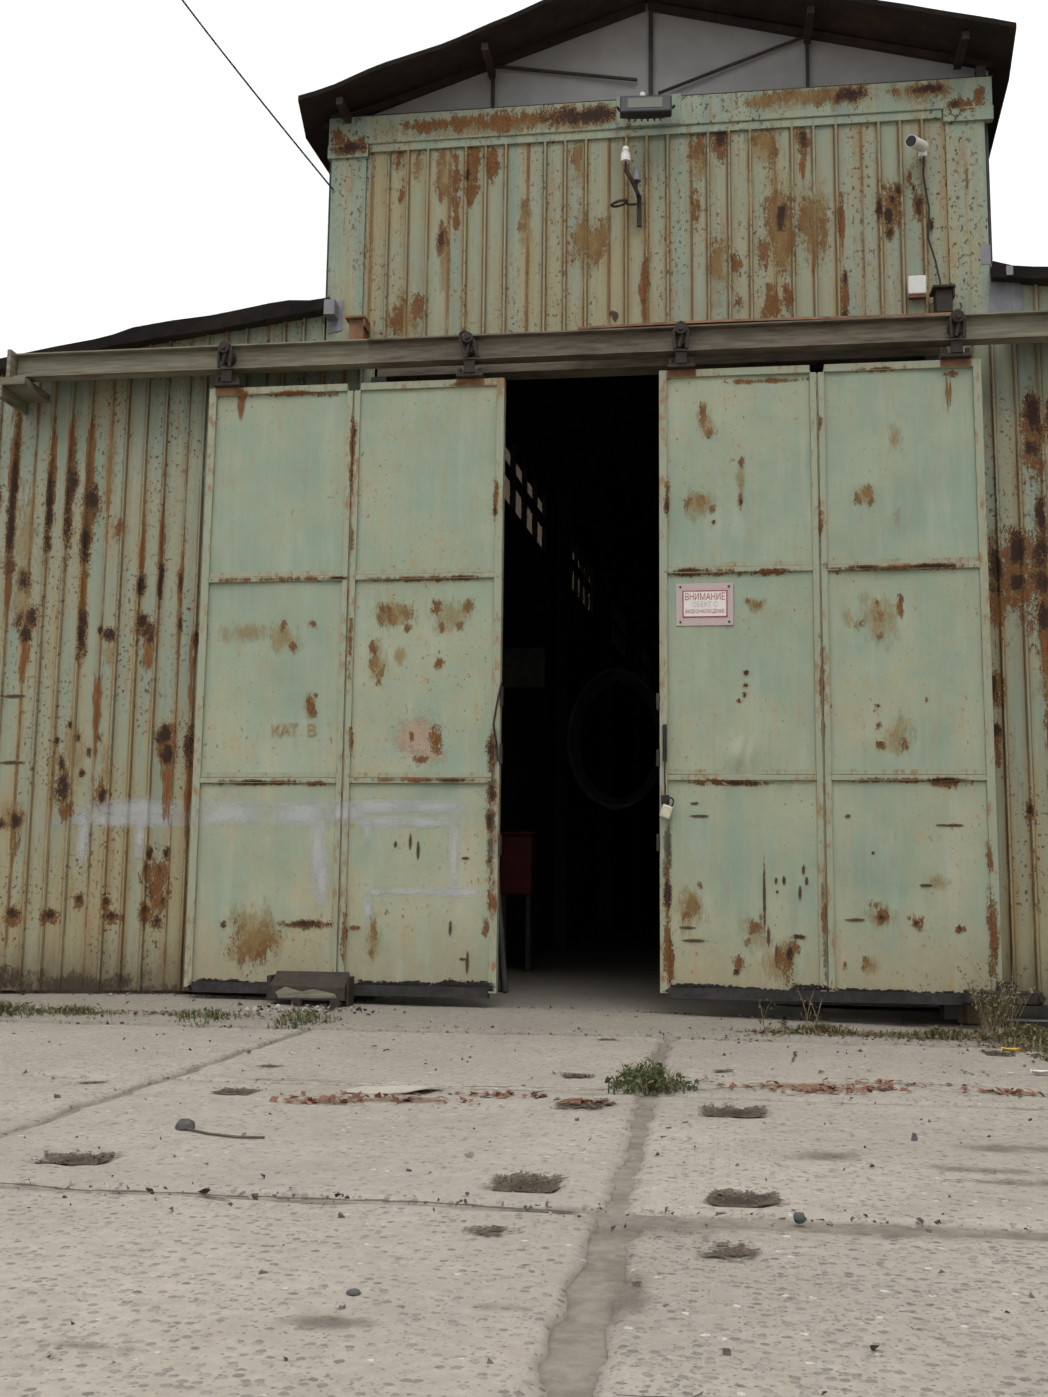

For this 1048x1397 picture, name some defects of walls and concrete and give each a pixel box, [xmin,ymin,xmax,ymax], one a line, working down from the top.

corrosion [735,80,988,112]
corrosion [389,102,627,280]
corrosion [707,127,850,318]
corrosion [874,163,935,242]
corrosion [0,410,89,669]
corrosion [365,574,480,686]
corrosion [818,370,1048,767]
corrosion [100,719,195,952]
corrosion [353,734,499,938]
corrosion [662,825,708,997]
corrosion [772,882,890,982]
corrosion [854,777,974,789]